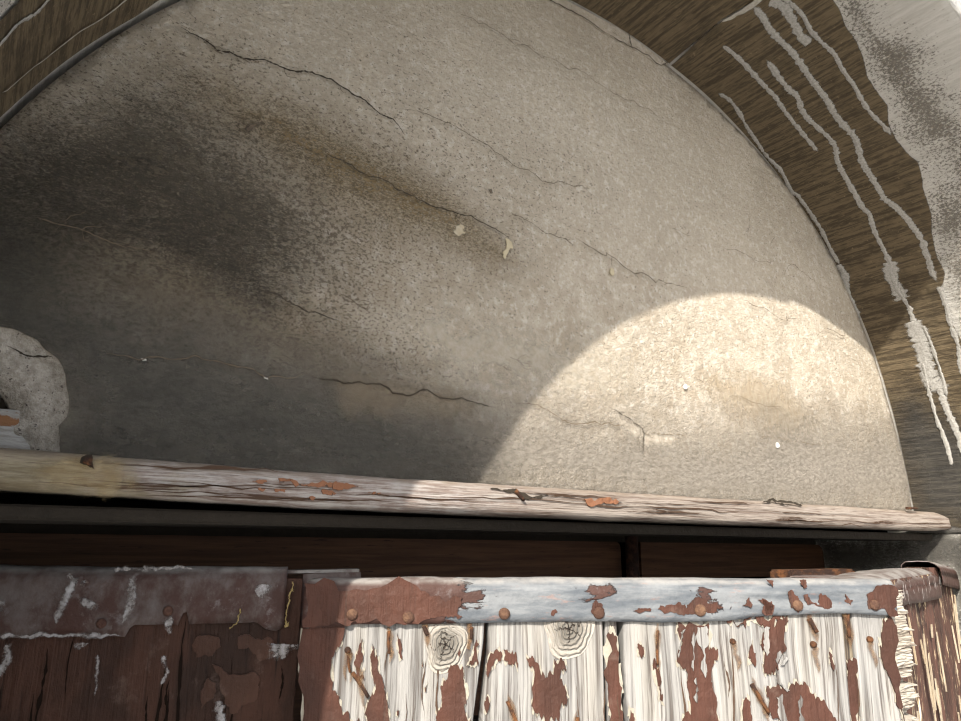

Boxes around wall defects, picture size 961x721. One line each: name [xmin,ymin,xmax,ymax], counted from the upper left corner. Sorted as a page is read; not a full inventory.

crack [181,27,589,192]
damp [0,0,961,507]
crack [321,146,683,287]
crack [106,353,488,419]
crack [518,403,684,451]
peeling [297,576,462,721]
peeling [436,640,568,721]
peeling [603,632,635,721]
peeling [635,597,723,721]
peeling [726,579,837,721]
peeling [829,652,860,721]
peeling [867,584,905,721]